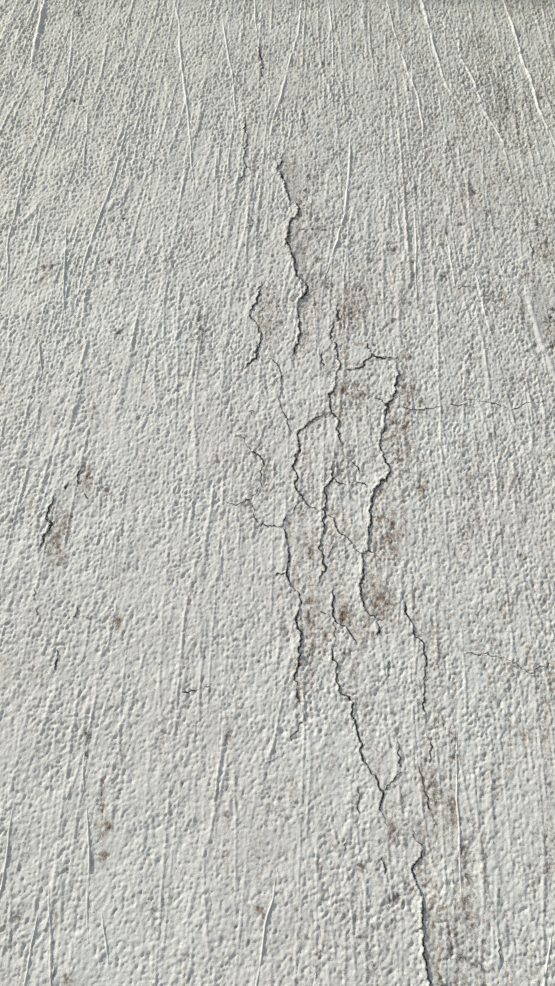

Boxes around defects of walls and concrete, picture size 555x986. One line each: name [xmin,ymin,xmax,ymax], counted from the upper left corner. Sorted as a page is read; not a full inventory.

crack [226,121,555,986]